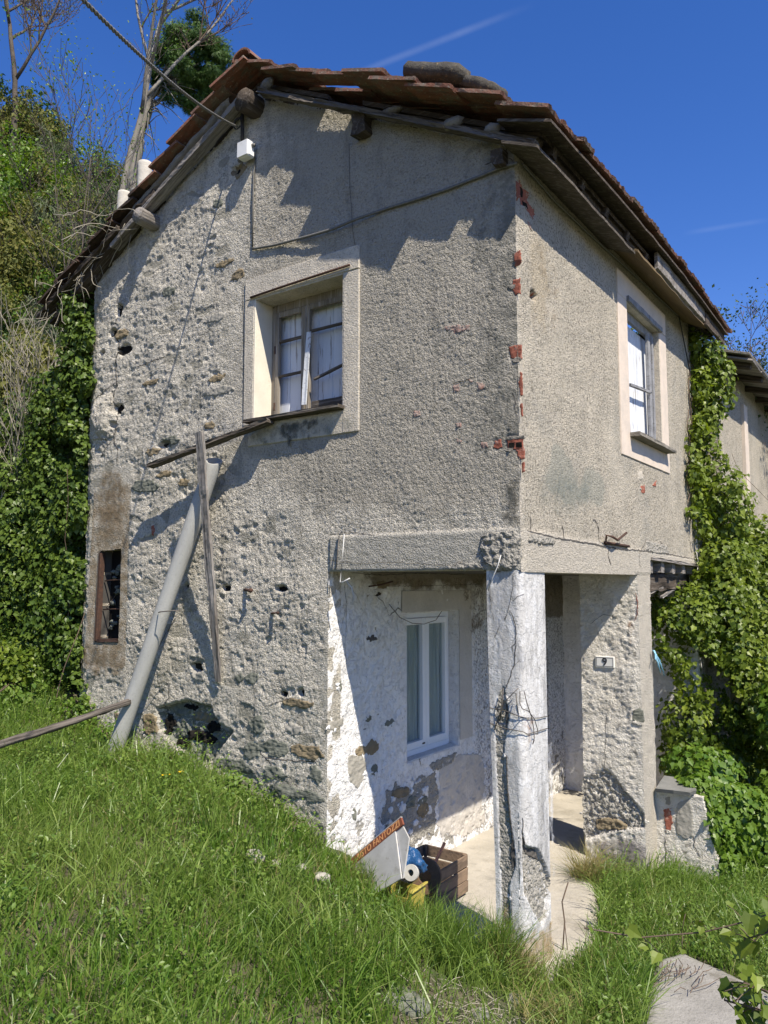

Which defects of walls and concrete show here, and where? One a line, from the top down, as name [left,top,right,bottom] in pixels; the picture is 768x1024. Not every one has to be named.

flaking render [516,175,535,231]
flaking render [508,250,534,298]
flaking render [509,344,523,417]
spalling [447,529,556,573]
corrosion [603,532,630,548]
peeling [378,752,458,847]
spalling [484,687,551,932]
peeling [579,769,649,838]
flaking render [663,807,673,834]